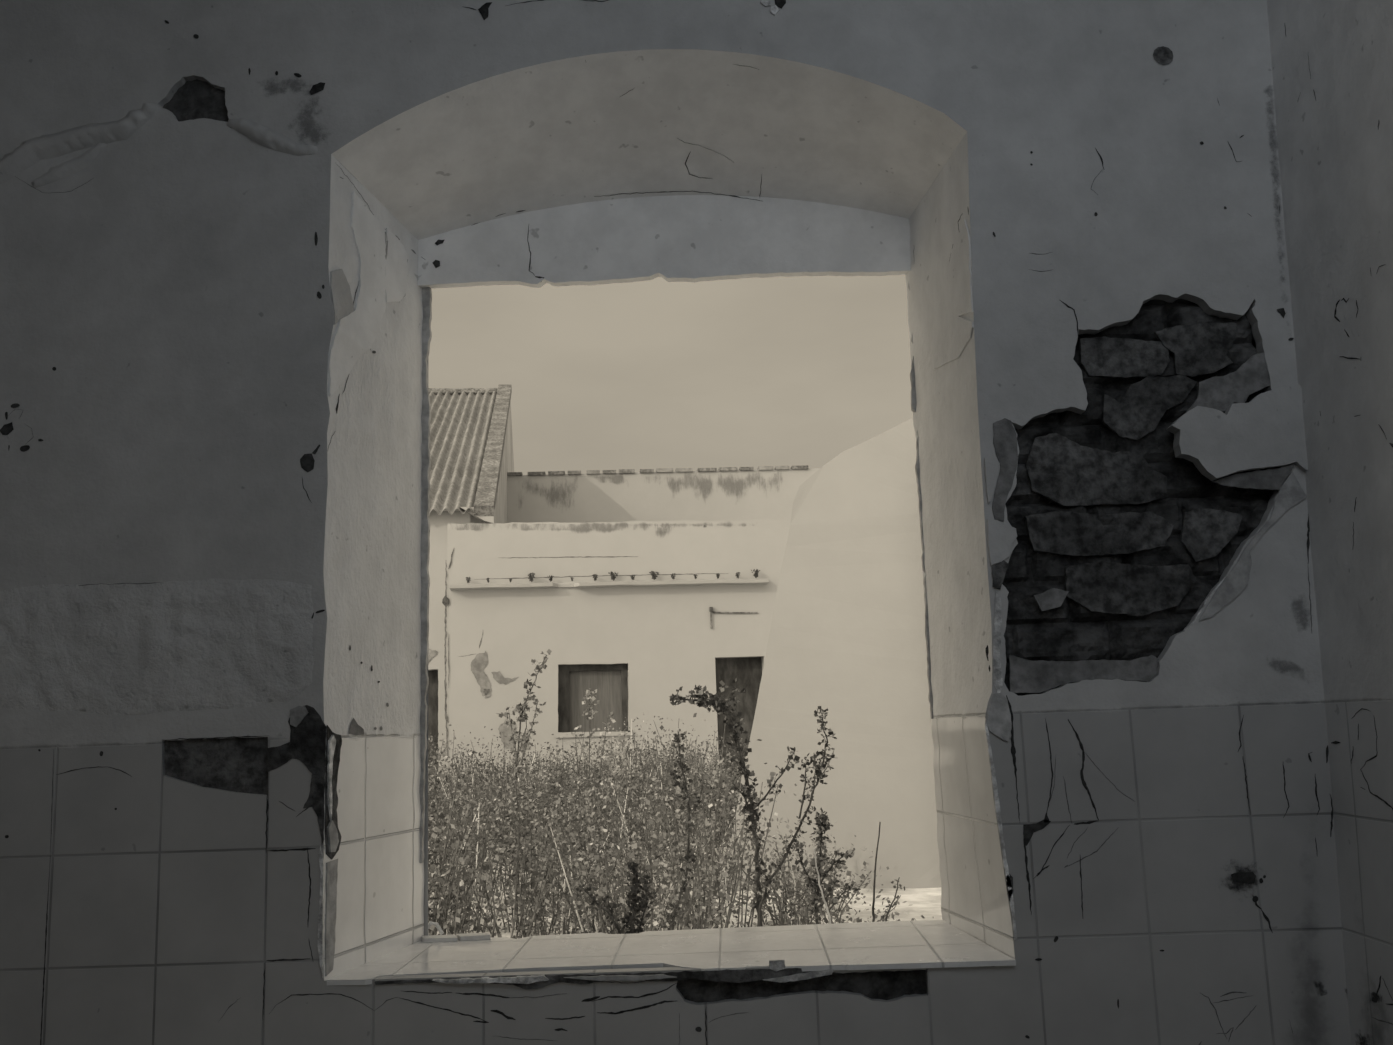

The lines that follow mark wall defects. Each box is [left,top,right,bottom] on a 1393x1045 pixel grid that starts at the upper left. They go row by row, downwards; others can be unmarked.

flaking render [163,79,229,122]
crack [171,734,261,742]
peeling [164,705,382,978]
crack [219,795,747,1045]
crack [1006,695,1134,916]
flaking render [984,299,1308,940]